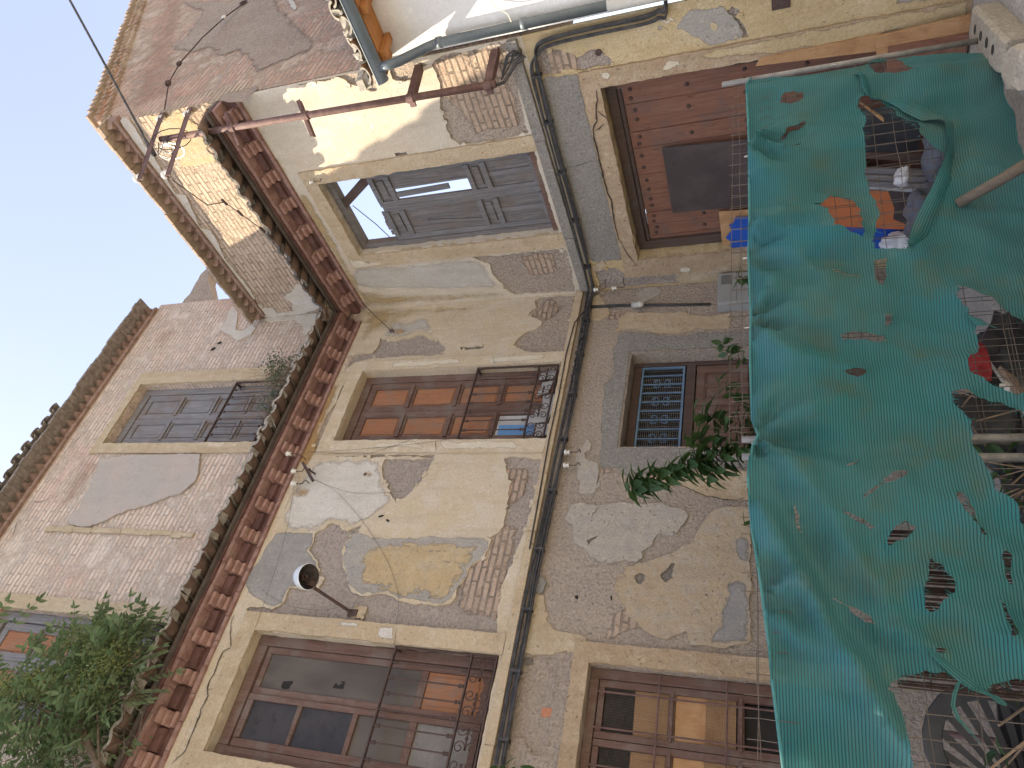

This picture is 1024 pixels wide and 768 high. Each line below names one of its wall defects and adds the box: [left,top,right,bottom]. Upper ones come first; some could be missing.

flaking render [312,73,358,88]
flaking render [391,42,528,146]
peeling [658,6,748,45]
crack [574,90,637,266]
flaking render [474,248,575,363]
flaking render [68,453,201,527]
flaking render [246,383,540,639]
flaking render [565,438,754,649]
crack [172,616,234,763]
flaking render [508,577,587,757]